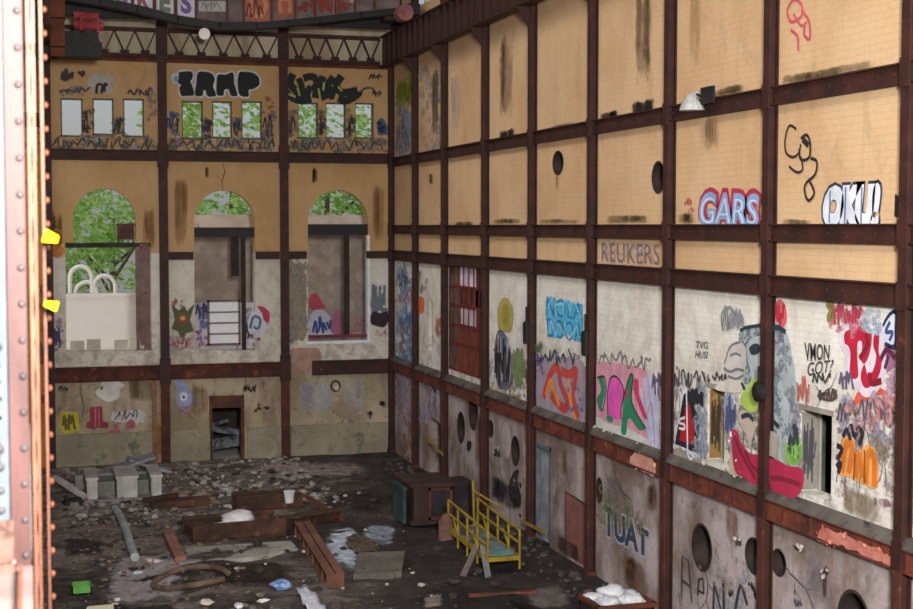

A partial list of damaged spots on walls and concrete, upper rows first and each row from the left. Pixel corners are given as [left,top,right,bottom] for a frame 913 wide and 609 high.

peeling [628,442,656,477]
peeling [816,525,891,566]